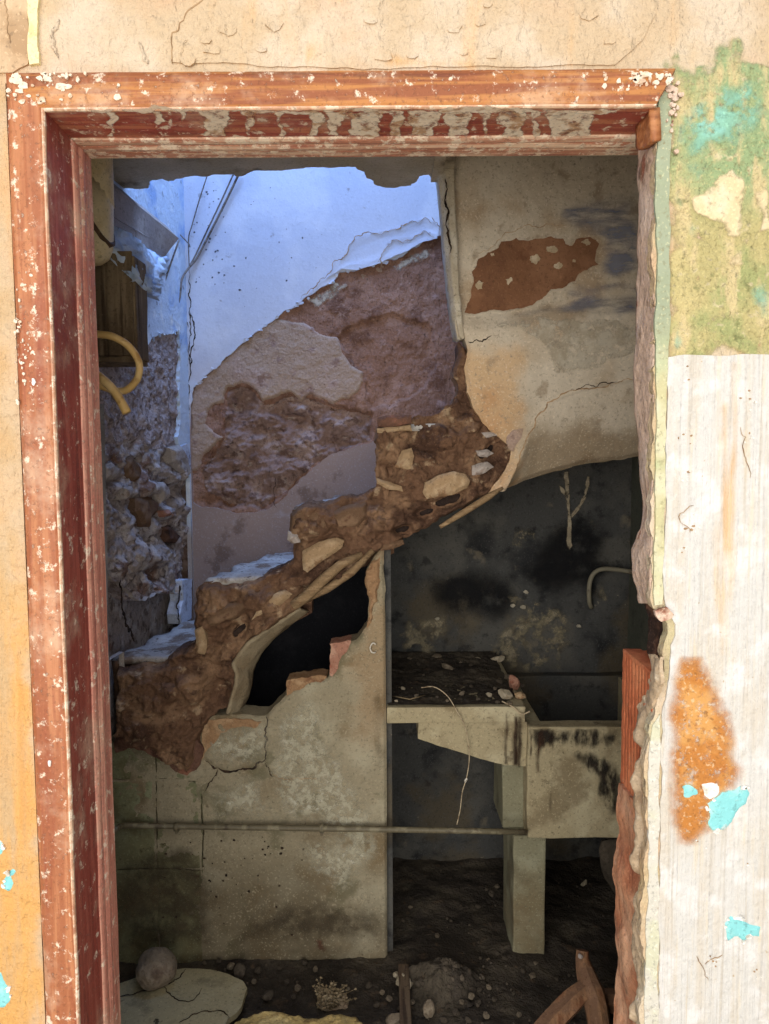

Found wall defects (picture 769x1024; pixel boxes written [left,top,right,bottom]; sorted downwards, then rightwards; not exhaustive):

peeling [6,71,98,105]
peeling [172,0,769,383]
crack [301,179,452,298]
spalling [99,217,463,601]
crack [510,378,632,483]
spalling [365,557,380,628]
flaking render [286,635,352,695]
peeling [405,617,443,651]
flaking render [201,718,262,760]
crack [204,717,320,791]
peeling [682,783,750,834]
peeling [723,915,760,945]